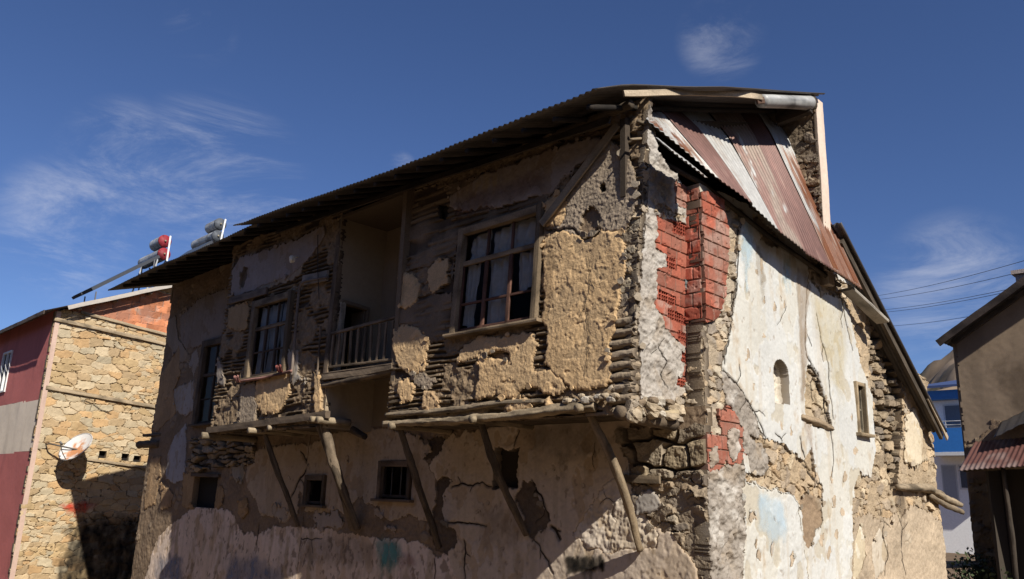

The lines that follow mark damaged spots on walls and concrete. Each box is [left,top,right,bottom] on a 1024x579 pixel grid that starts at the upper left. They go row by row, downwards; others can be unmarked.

corrosion [795,168,859,284]
peeling [144,137,779,579]
spalling [724,254,942,579]
crack [448,521,484,577]
crack [452,477,497,491]
crack [532,481,560,572]